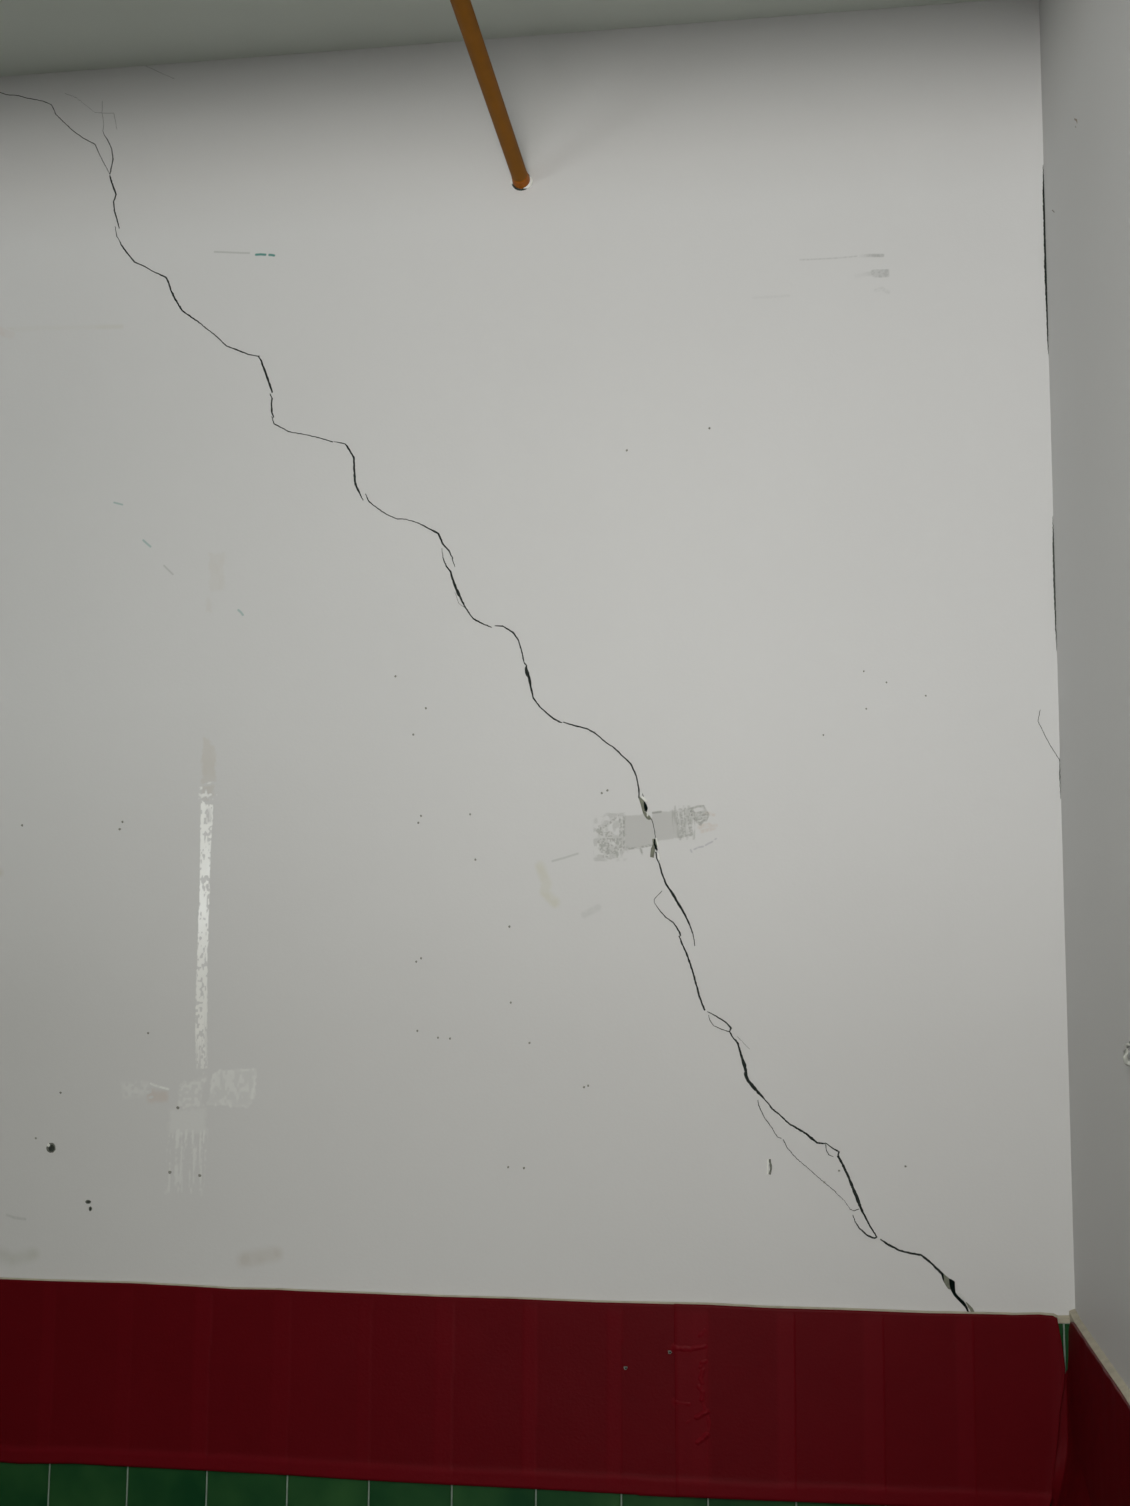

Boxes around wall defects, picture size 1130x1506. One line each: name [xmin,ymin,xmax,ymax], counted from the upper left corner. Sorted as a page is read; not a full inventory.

crack [0,92,969,1311]
spalling [639,796,651,820]
spalling [650,838,660,861]